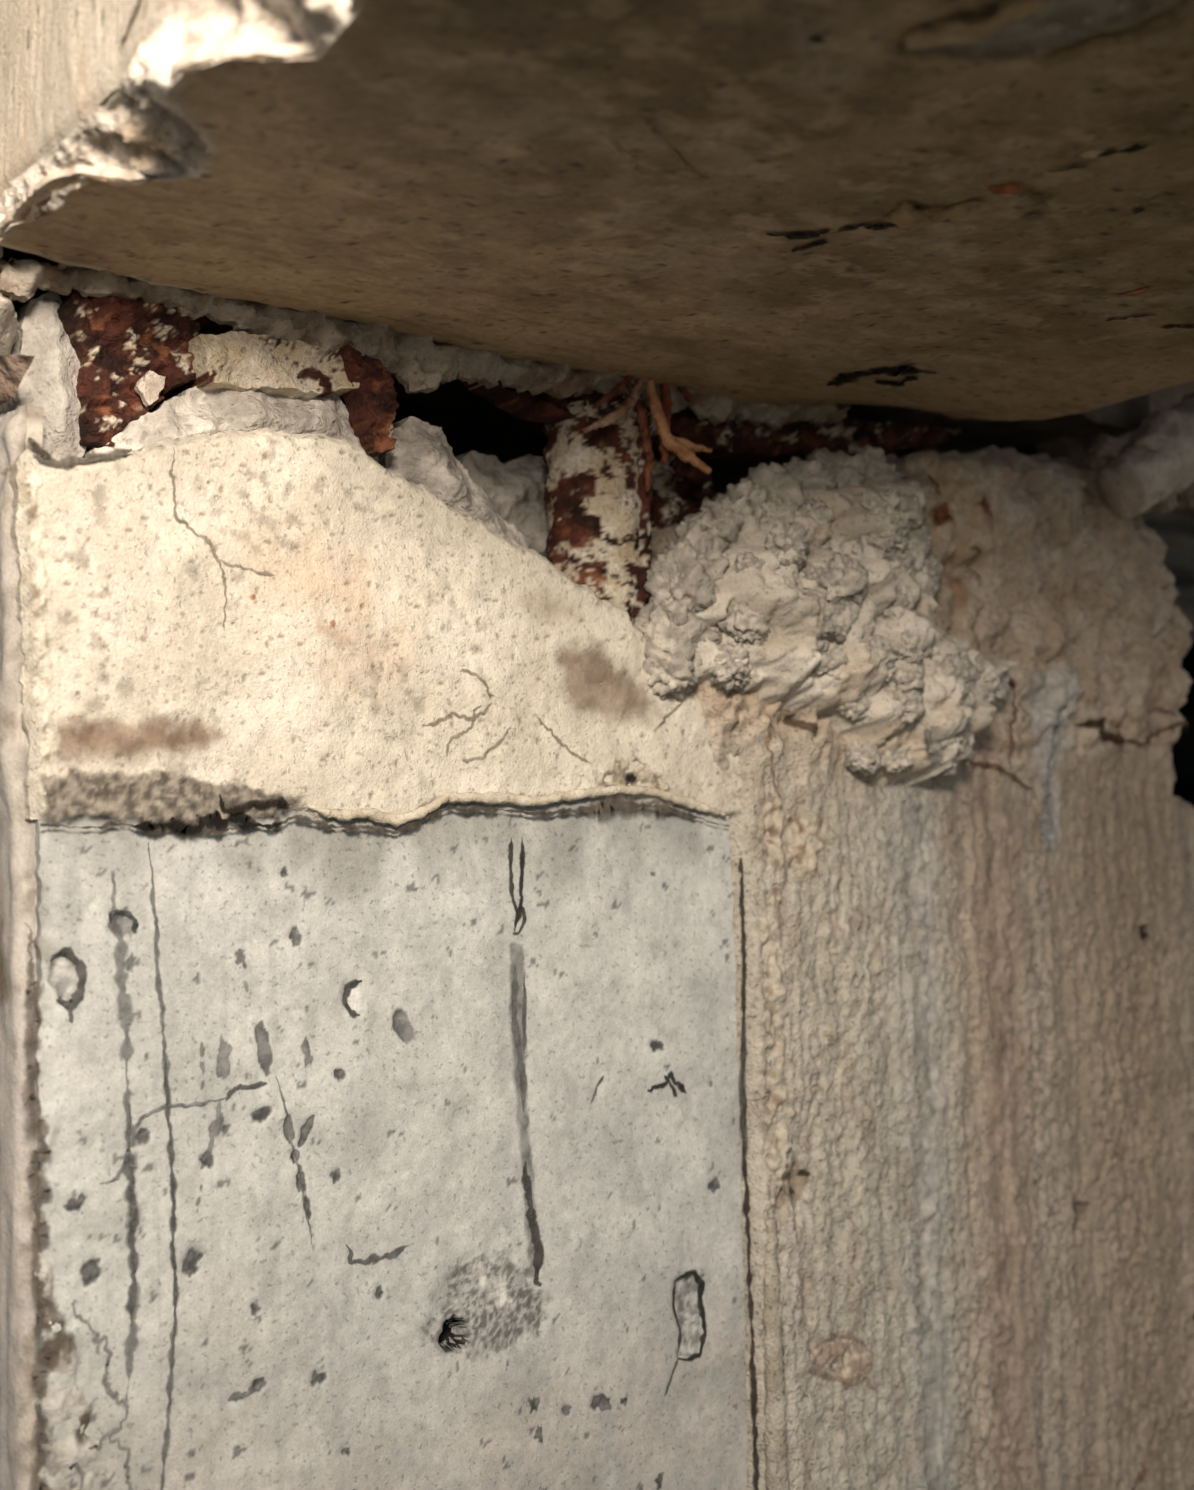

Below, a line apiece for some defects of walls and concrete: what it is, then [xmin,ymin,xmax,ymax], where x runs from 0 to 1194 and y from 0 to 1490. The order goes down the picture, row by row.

spalling [0,0,364,241]
corrosion [195,316,233,335]
spalling [0,354,35,406]
peeling [135,370,166,407]
corrosion [297,367,330,387]
corrosion [462,381,575,425]
crack [27,437,133,468]
crack [169,447,274,630]
corrosion [632,406,1013,632]
water stain [60,718,211,756]
spalling [43,768,301,824]
crack [40,669,790,1490]